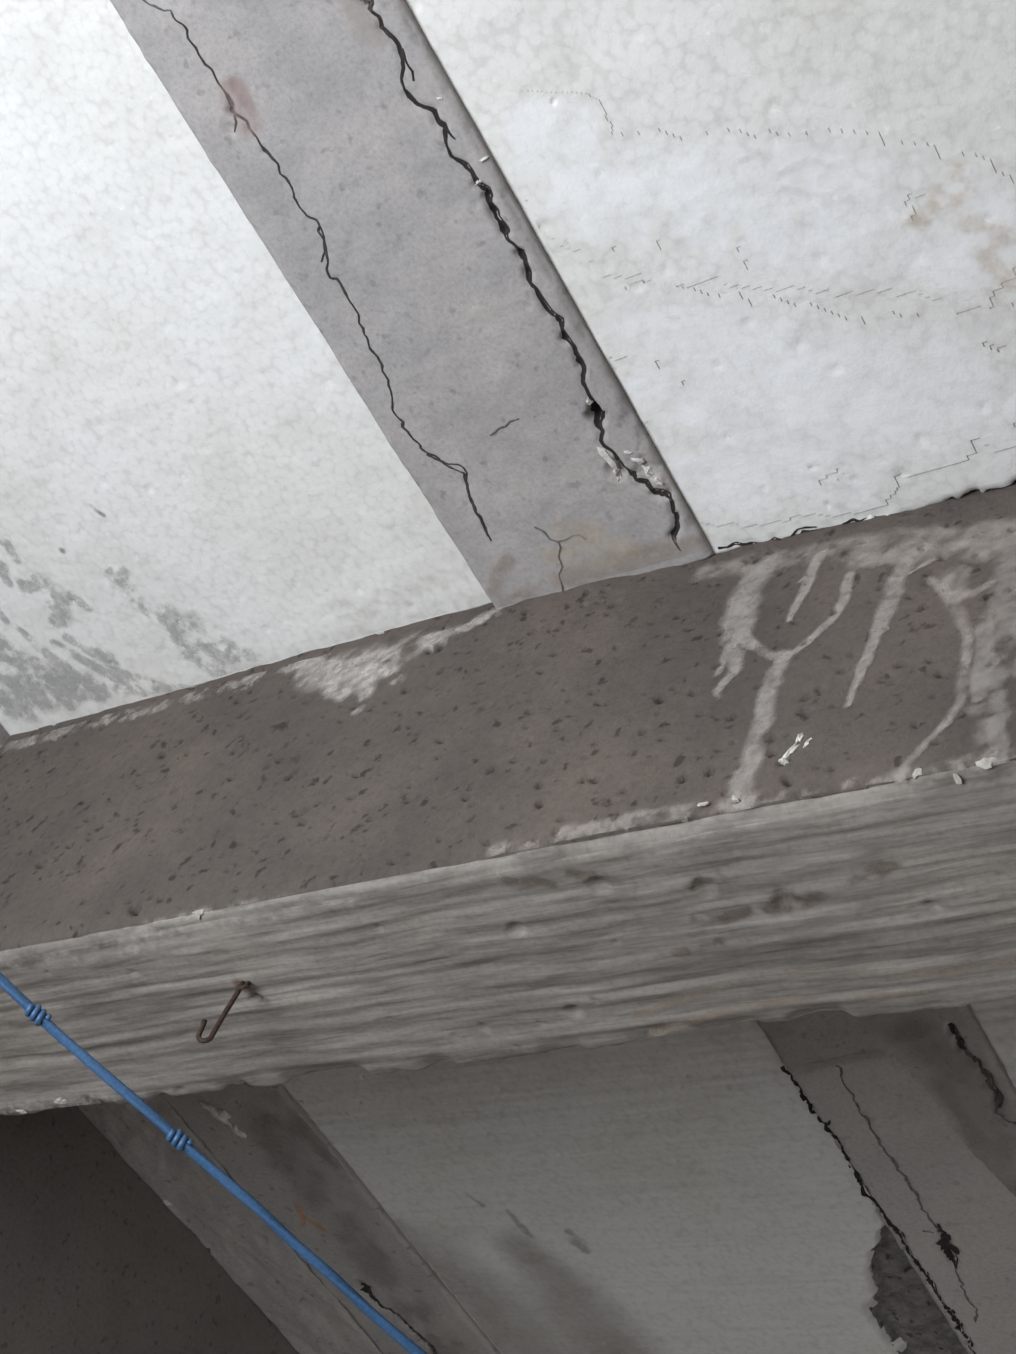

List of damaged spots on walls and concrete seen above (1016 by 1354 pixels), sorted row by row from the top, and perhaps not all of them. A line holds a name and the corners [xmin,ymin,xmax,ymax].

crack [143,0,491,541]
crack [360,0,681,551]
crack [534,527,587,592]
crack [718,511,904,550]
crack [949,480,1016,500]
crack [948,1023,1016,1125]
crack [780,1065,978,1354]
spalling [869,1225,968,1354]